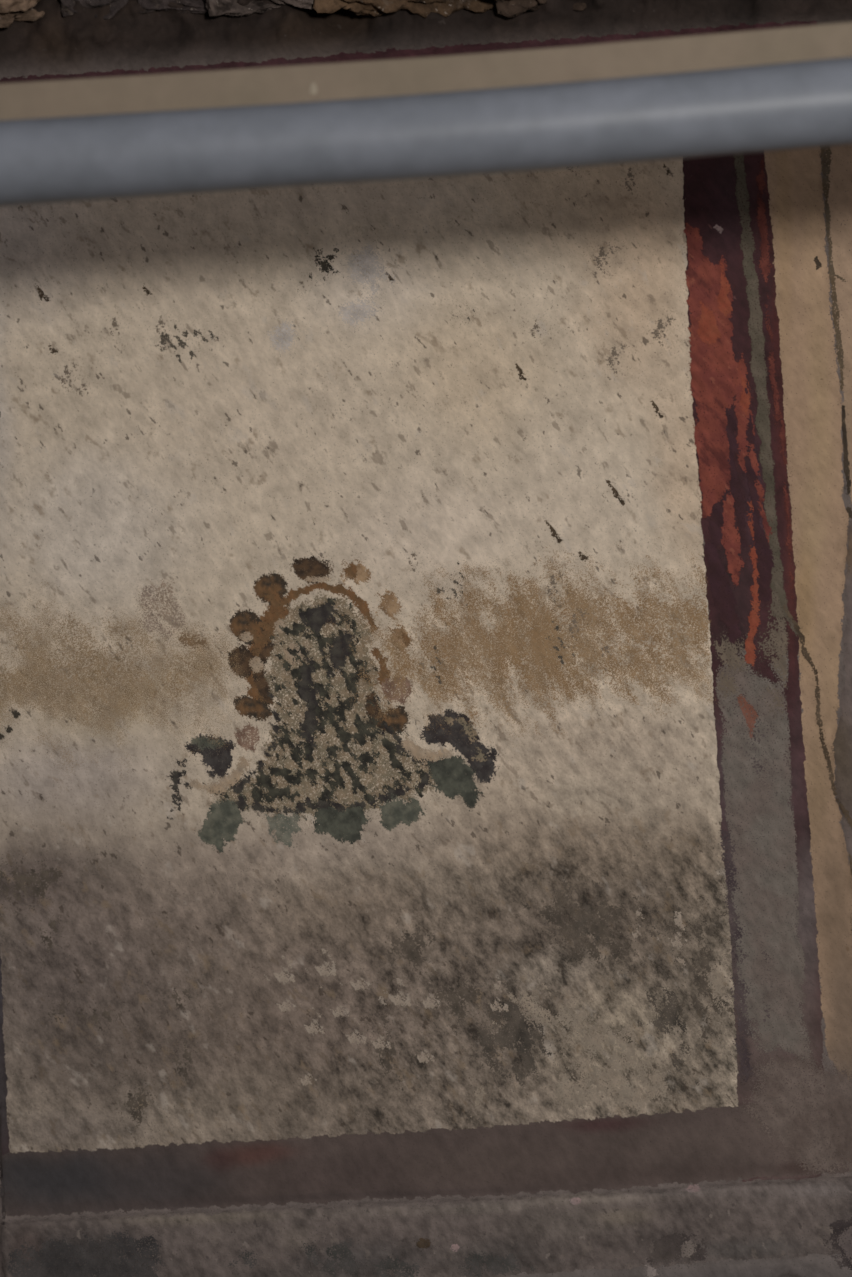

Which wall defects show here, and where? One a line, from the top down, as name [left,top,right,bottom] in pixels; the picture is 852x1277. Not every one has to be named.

water stain [297,242,395,327]
water stain [0,578,267,781]
water stain [329,154,852,1180]
water stain [116,1069,157,1141]